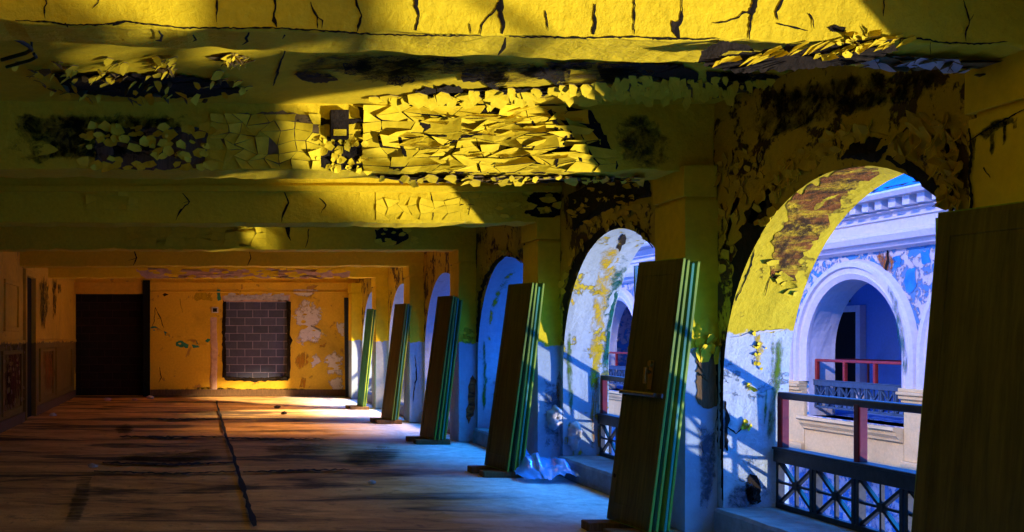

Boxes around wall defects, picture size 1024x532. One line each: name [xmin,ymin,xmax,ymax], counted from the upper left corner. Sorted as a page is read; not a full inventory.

crack [15,0,814,86]
crack [281,192,326,248]
peeling [11,25,1004,344]
damp [758,74,938,135]
crack [968,109,1024,208]
peeling [136,267,350,389]
crack [94,401,350,527]
spalling [696,340,761,508]